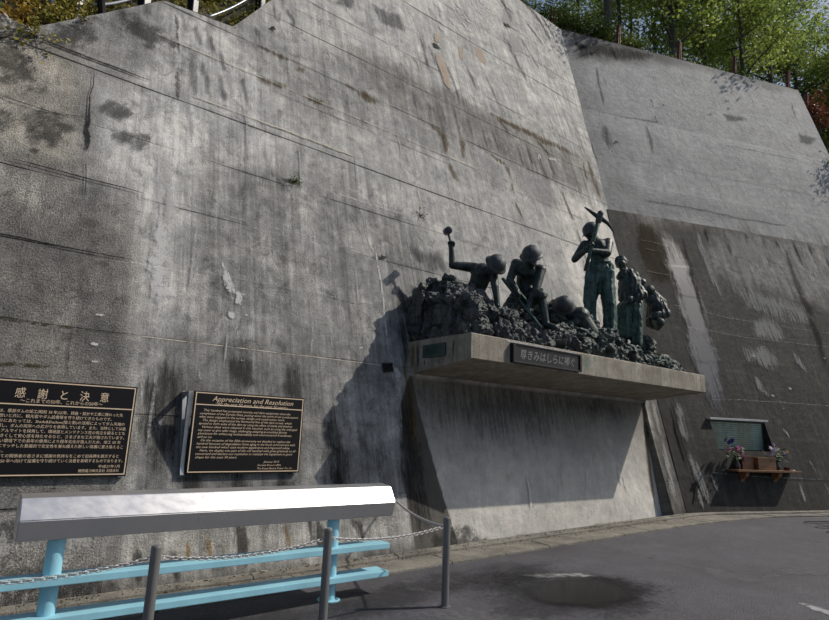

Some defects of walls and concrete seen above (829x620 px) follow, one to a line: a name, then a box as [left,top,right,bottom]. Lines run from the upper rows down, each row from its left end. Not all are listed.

crack [0,13,149,151]
crack [19,160,143,193]